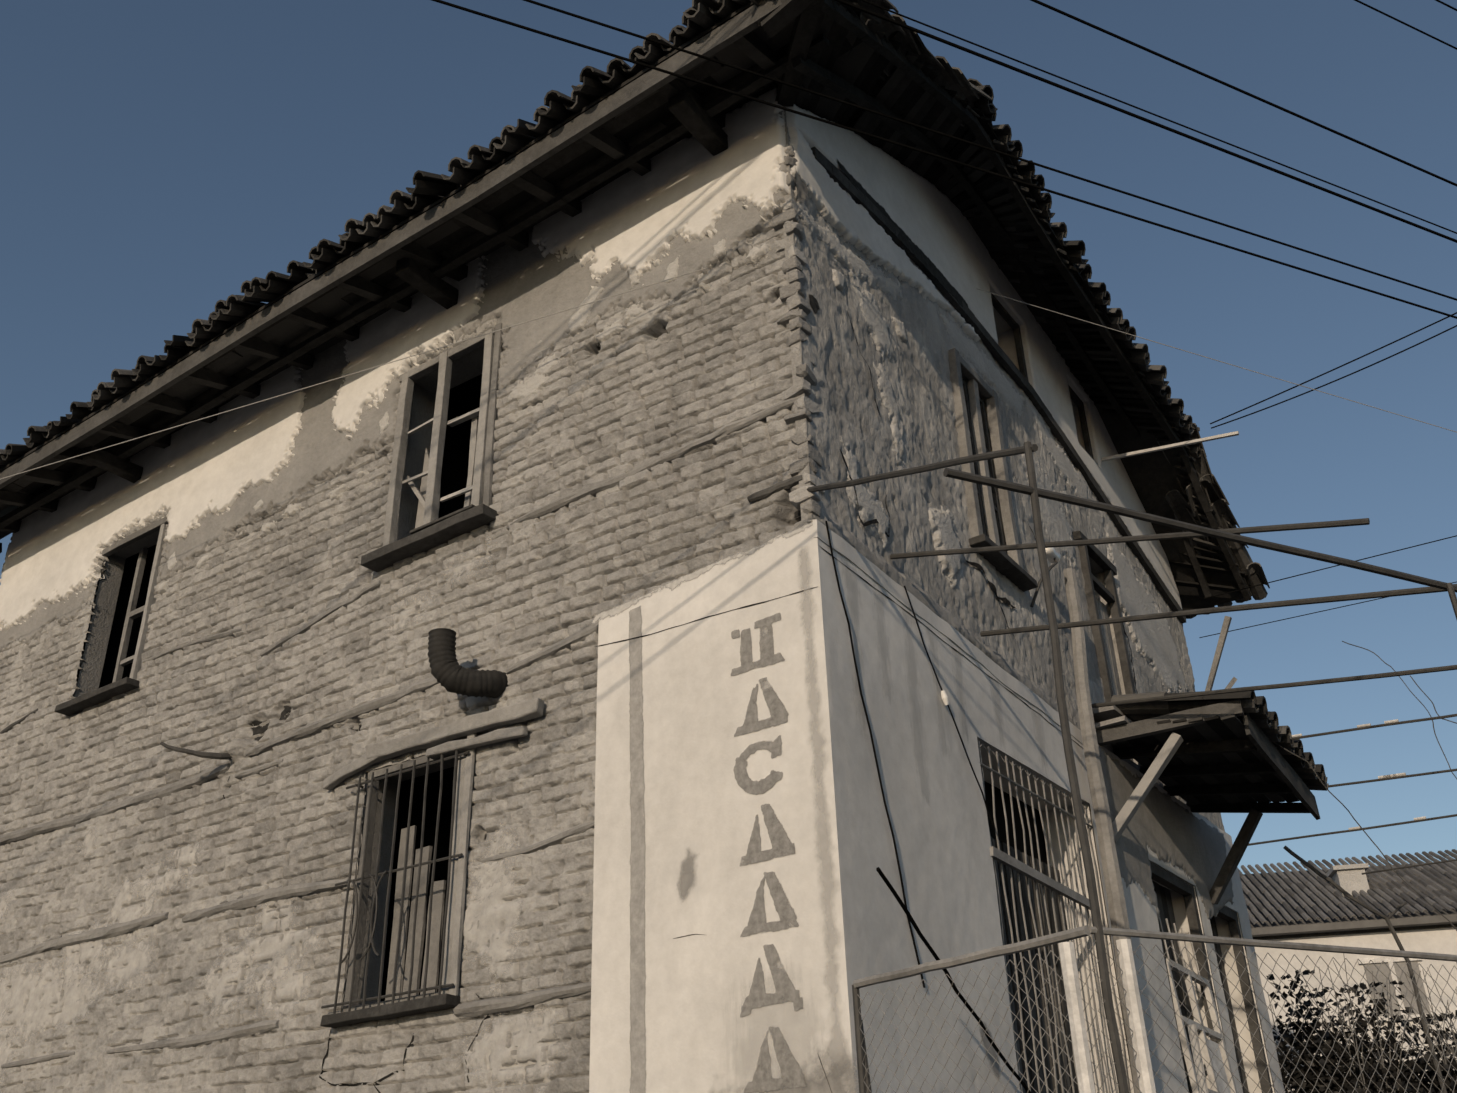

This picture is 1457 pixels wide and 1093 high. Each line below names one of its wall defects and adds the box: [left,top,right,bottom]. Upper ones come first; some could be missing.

flaking render [330,256,488,440]
peeling [507,354,565,402]
flaking render [531,87,1088,569]
flaking render [0,366,307,631]
spalling [592,510,813,624]
flaking render [928,505,965,589]
flaking render [1106,532,1188,693]
spalling [248,705,291,741]